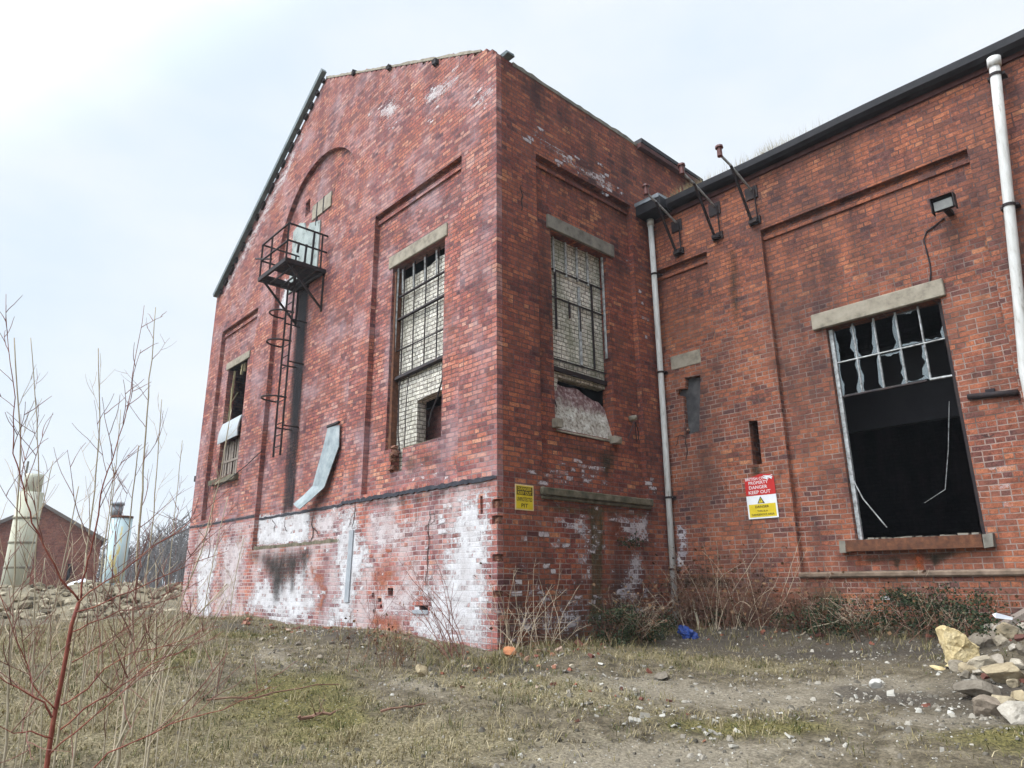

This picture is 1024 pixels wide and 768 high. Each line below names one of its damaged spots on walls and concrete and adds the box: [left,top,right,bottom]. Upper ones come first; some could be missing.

leakage [256,554,305,594]
leakage [556,507,603,623]